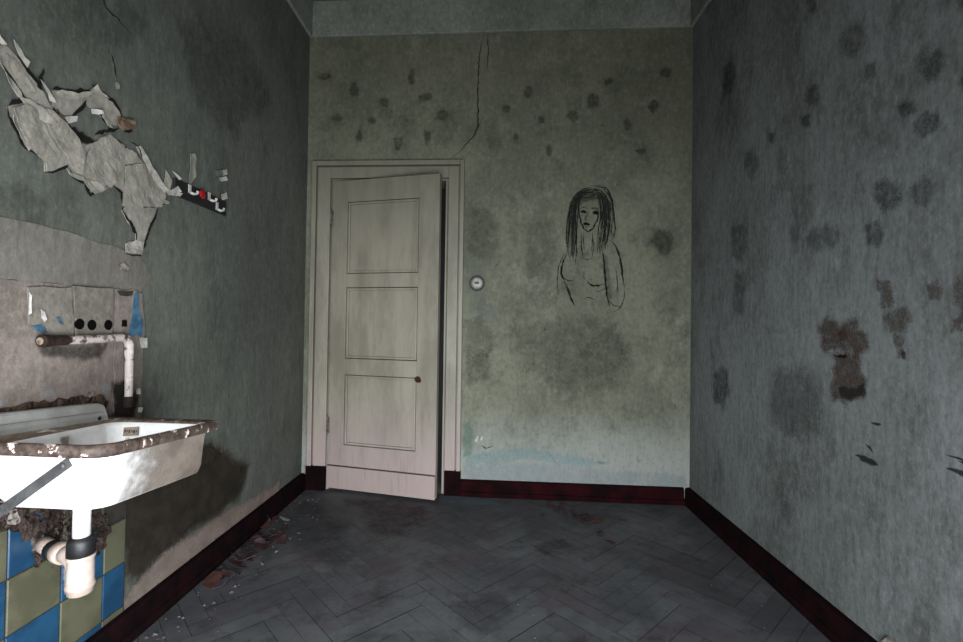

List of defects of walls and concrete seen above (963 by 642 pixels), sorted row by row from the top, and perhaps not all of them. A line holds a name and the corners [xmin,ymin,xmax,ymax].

crack [450,36,489,159]
peeling [215,169,228,200]
flaking render [0,35,197,418]
damp [877,280,910,359]
damp [819,320,868,403]